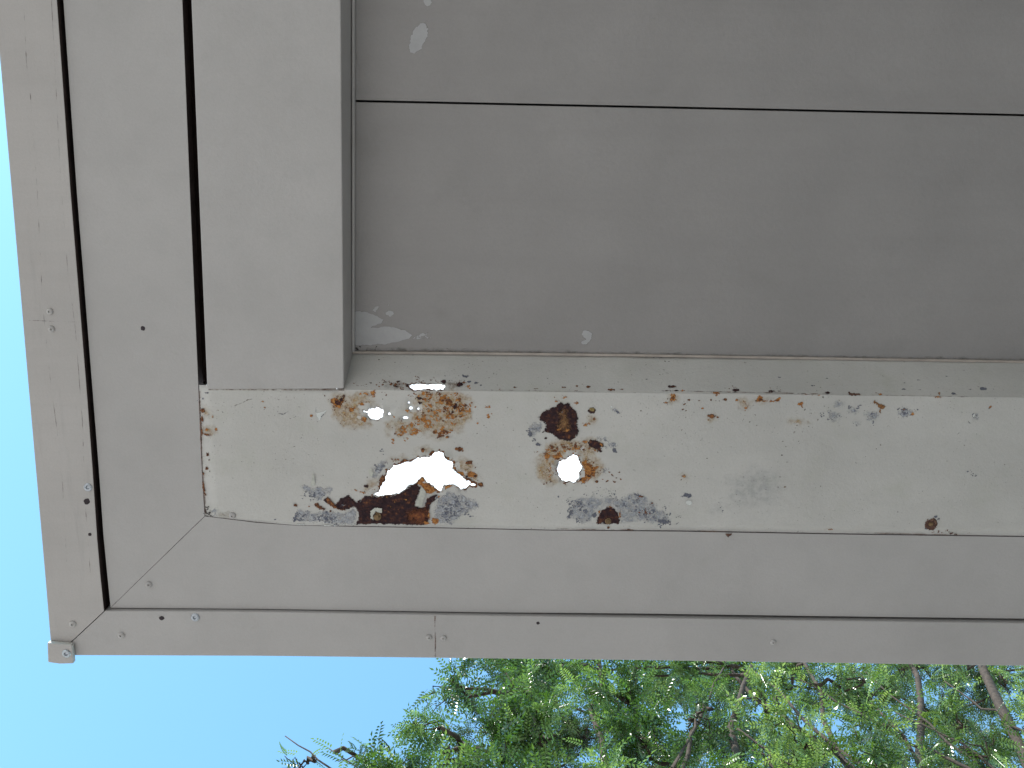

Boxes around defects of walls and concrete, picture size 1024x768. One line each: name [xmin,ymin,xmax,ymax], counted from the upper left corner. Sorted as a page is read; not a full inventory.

peeling [409,21,428,54]
peeling [355,304,431,346]
corrosion [665,382,781,418]
corrosion [324,375,492,487]
corrosion [536,385,622,485]
corrosion [294,459,452,525]
peeling [425,492,478,524]
corrosion [582,506,630,530]
peeling [558,487,681,528]
corrosion [916,516,970,535]